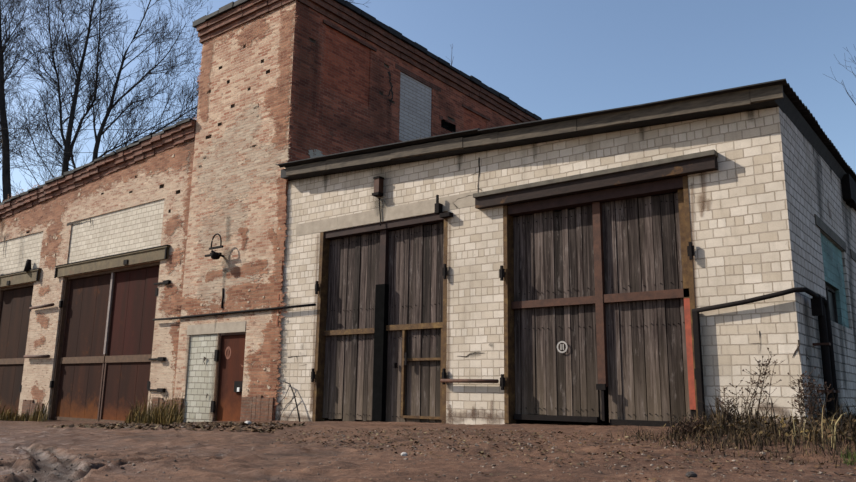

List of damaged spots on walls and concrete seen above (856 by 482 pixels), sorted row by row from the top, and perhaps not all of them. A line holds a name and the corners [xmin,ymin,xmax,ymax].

peeling [193,1,297,151]
peeling [0,138,289,408]